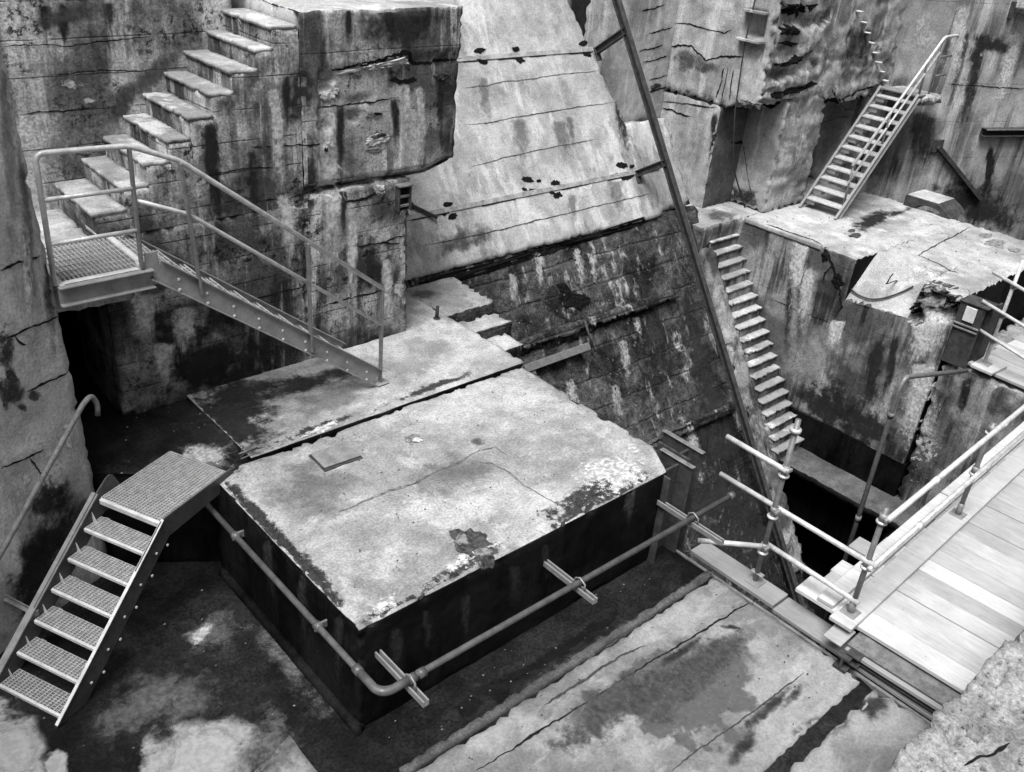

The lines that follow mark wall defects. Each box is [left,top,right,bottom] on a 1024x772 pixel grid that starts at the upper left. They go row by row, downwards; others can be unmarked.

crack [640,4,741,117]
crack [478,102,610,124]
spalling [365,133,390,153]
damp [249,66,393,322]
crack [357,193,651,248]
efflorescence [535,254,543,284]
efflorescence [574,249,596,281]
spalling [909,280,961,314]
efflorescence [620,341,630,373]
crack [338,446,561,512]
spalling [440,528,501,579]
damp [549,635,747,745]